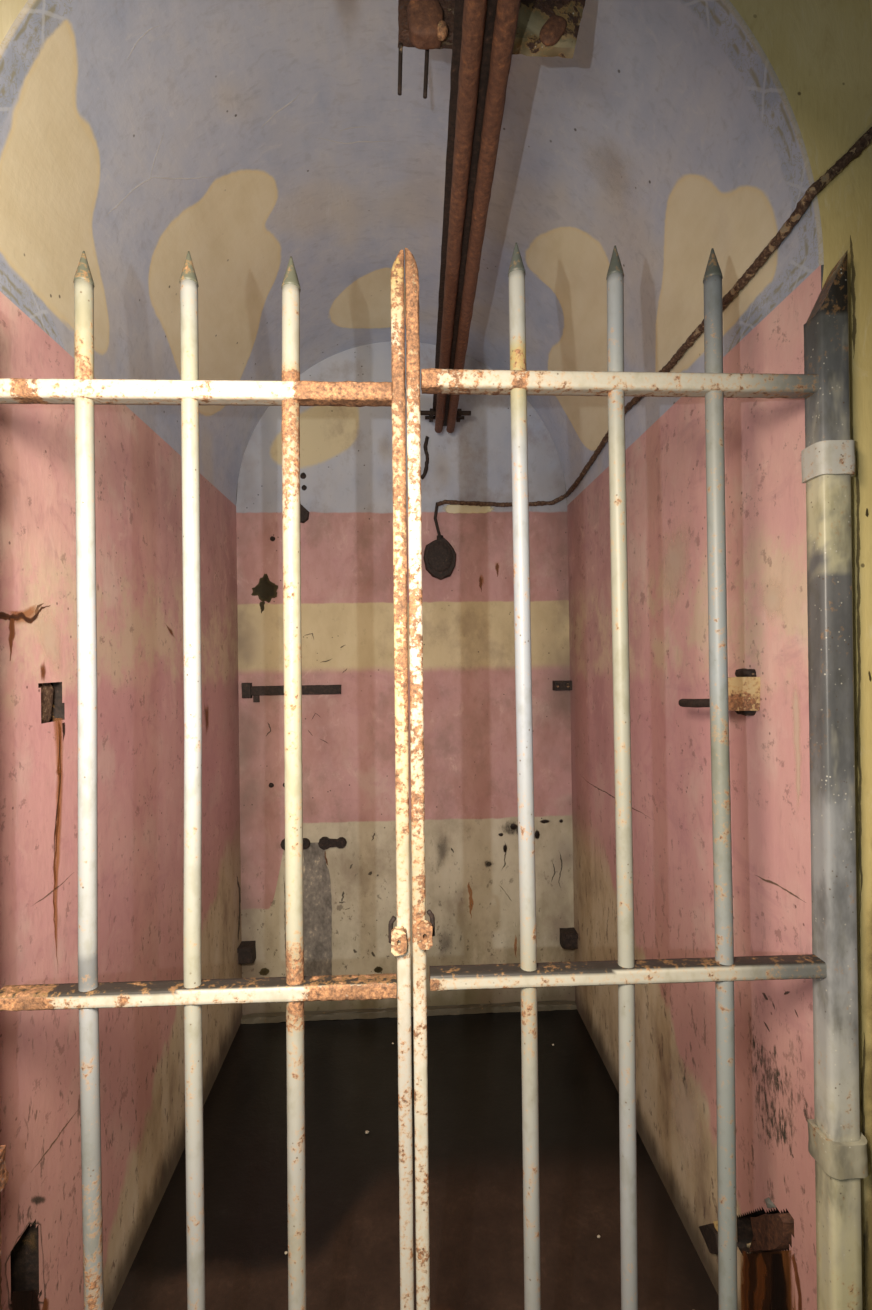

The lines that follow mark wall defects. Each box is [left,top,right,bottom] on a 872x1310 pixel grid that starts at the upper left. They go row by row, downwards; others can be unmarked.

corrosion [53,718,65,962]
damp [752,1041,808,1158]